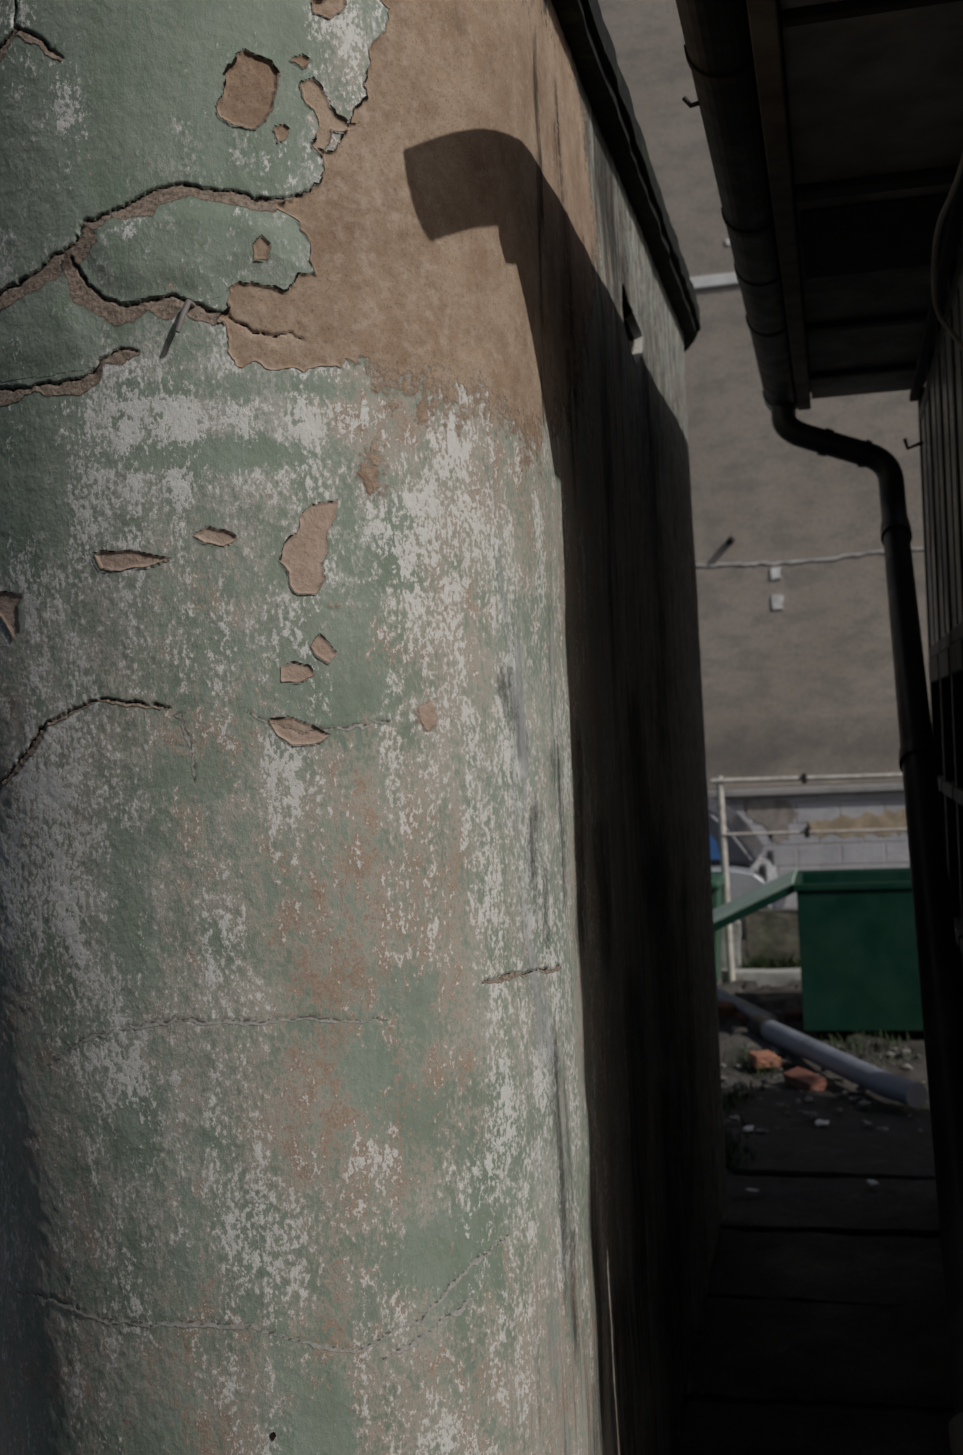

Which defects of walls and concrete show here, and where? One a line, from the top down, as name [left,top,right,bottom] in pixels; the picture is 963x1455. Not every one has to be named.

water stain [534,66,561,317]
water stain [583,96,627,309]
crack [0,184,311,406]
peeling [93,549,172,571]
peeling [194,526,237,546]
peeling [279,499,341,606]
peeling [0,591,21,641]
peeling [281,633,337,683]
crack [0,698,197,788]
peeling [268,717,331,746]
peeling [416,700,439,731]
crack [482,965,562,984]